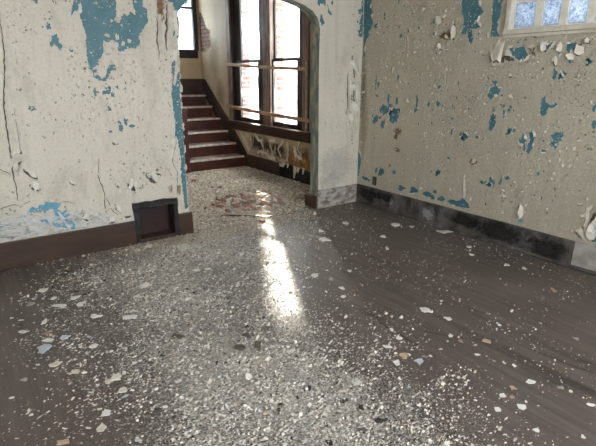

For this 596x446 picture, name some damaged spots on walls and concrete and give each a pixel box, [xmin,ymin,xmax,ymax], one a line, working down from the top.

spalling [198,12,212,53]
crack [0,8,30,210]
peeling [27,0,188,209]
peeling [343,0,596,226]
spalling [262,136,310,185]
peeling [0,185,111,243]
crack [93,159,120,222]
water stain [359,189,394,206]
water stain [451,213,563,259]